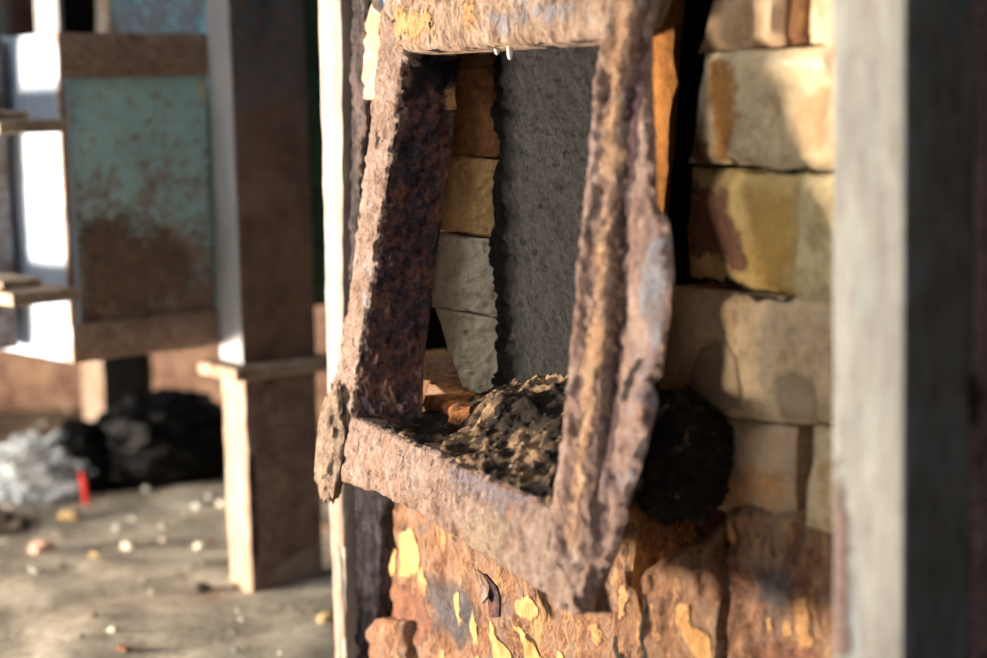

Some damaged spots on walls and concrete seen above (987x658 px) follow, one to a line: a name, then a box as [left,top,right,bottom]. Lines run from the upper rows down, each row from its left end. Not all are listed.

corrosion [390,0,436,49]
corrosion [461,0,575,37]
corrosion [444,87,457,110]
peeling [348,0,372,301]
corrosion [564,0,651,557]
corrosion [448,467,525,565]
spalling [389,528,428,593]
corrosion [329,487,502,658]
spalling [454,592,477,644]
spalling [489,622,511,658]
spalling [513,595,541,658]
spalling [618,585,628,620]